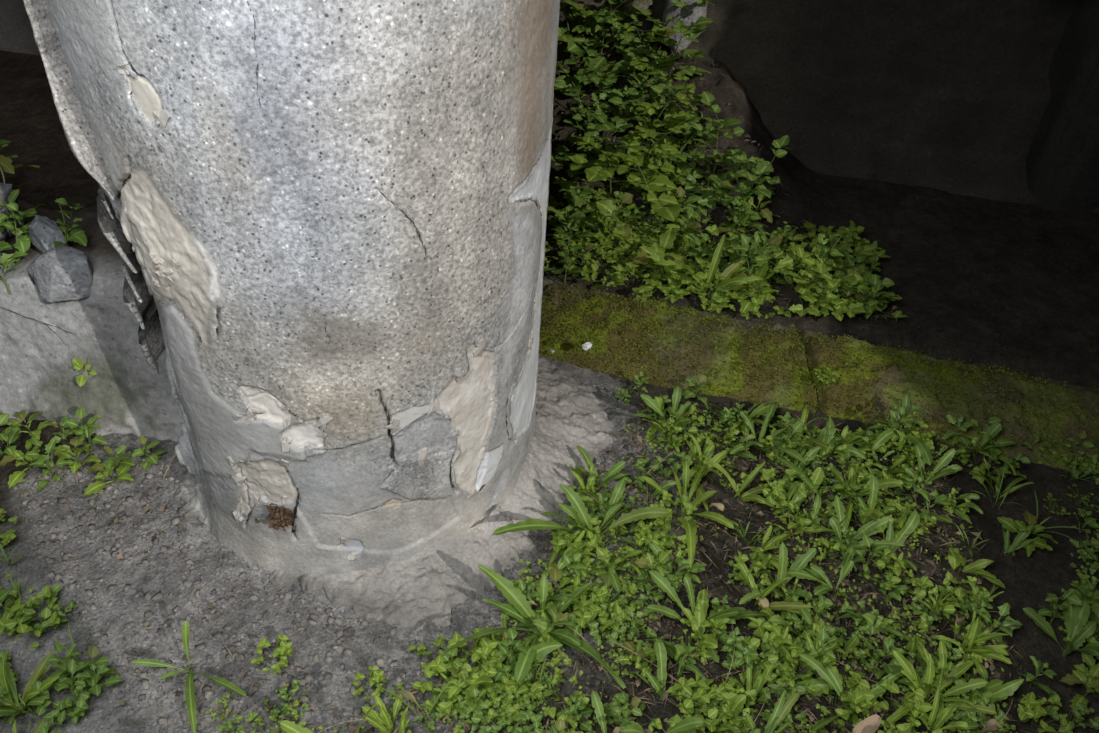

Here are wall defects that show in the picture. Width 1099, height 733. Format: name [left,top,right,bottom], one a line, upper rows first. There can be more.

flaking render [23,0,214,375]
crack [379,191,427,254]
spalling [386,109,553,499]
spalling [226,385,333,524]
spalling [338,537,364,560]